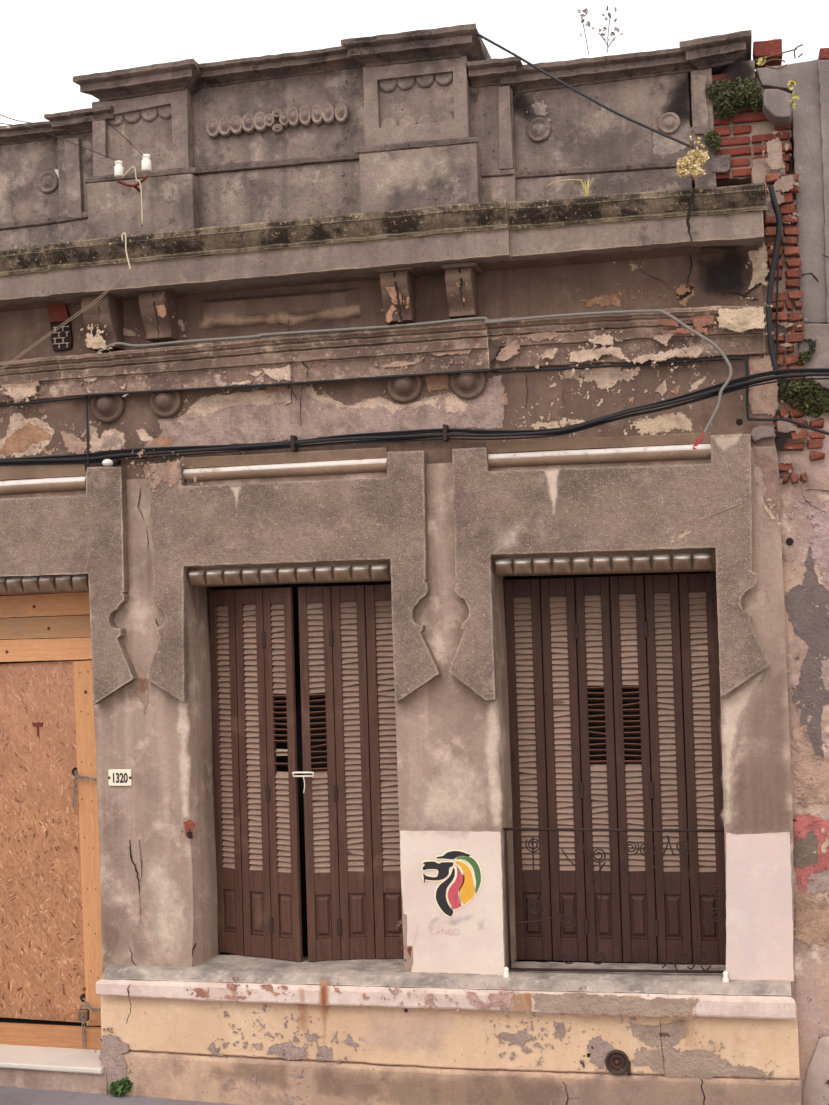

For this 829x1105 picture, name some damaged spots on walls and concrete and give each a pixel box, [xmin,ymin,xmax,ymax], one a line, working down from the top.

spalling [763,89,792,126]
crack [640,188,695,287]
crack [393,271,403,323]
crack [457,267,465,307]
peeling [0,230,774,507]
peeling [736,350,829,957]
spalling [181,819,201,839]
crack [129,840,142,898]
corrosion [320,979,328,1013]
peeling [186,976,365,1105]